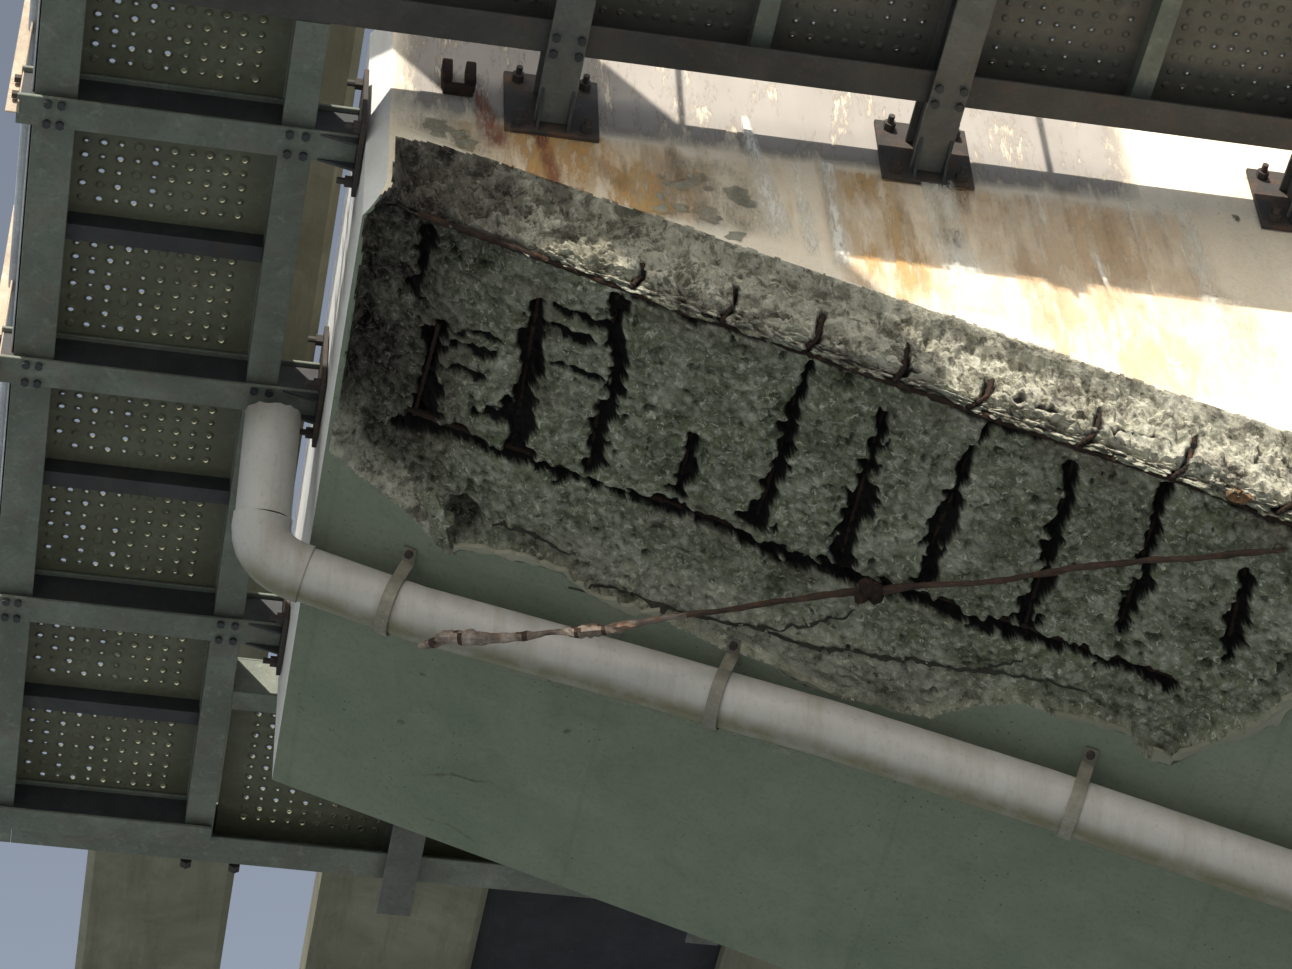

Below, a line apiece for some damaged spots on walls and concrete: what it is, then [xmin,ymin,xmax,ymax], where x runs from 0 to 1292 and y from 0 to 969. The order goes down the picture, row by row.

spalling [329,118,1292,765]
corrosion [844,172,931,301]